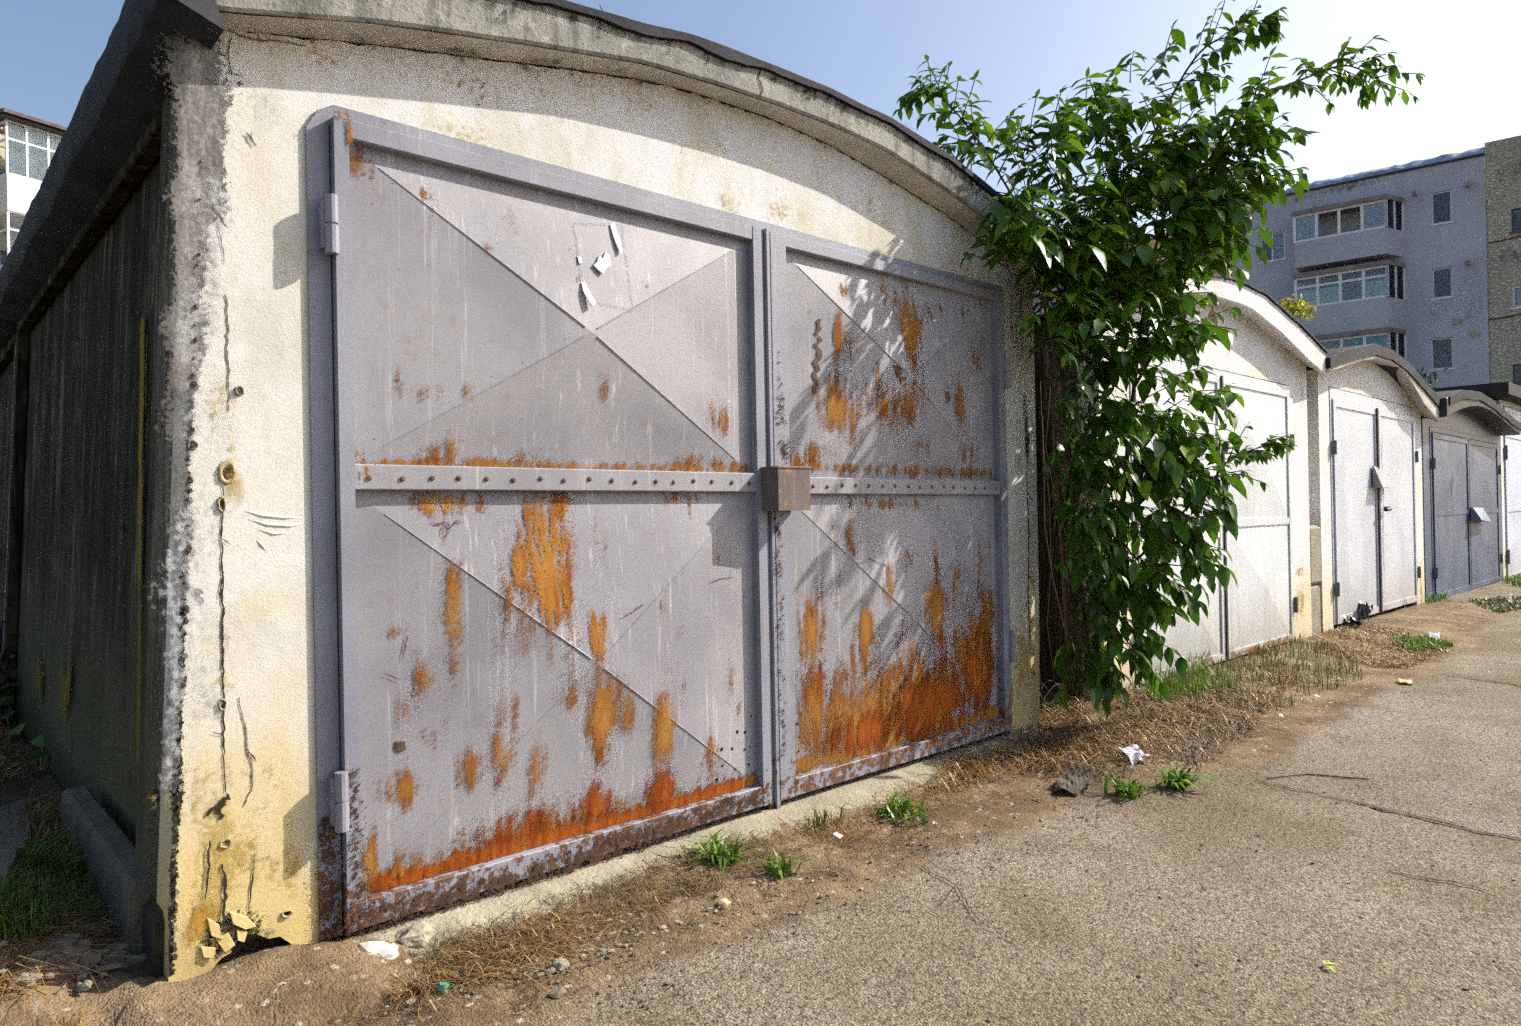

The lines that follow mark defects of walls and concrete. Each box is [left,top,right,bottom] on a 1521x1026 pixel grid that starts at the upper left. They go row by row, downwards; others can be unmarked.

corrosion [334,109,375,179]
corrosion [708,400,729,436]
corrosion [355,430,749,480]
corrosion [314,491,770,941]